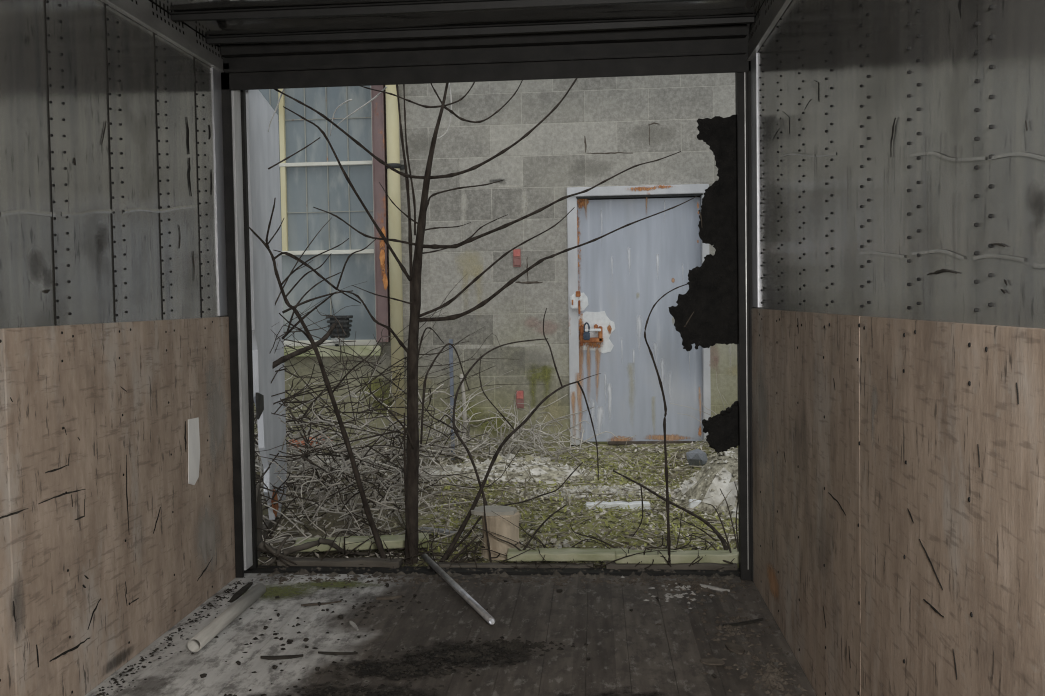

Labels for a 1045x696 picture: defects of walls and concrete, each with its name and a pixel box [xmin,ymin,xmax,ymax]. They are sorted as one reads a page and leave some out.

corrosion [379,227,388,290]
corrosion [572,314,601,430]